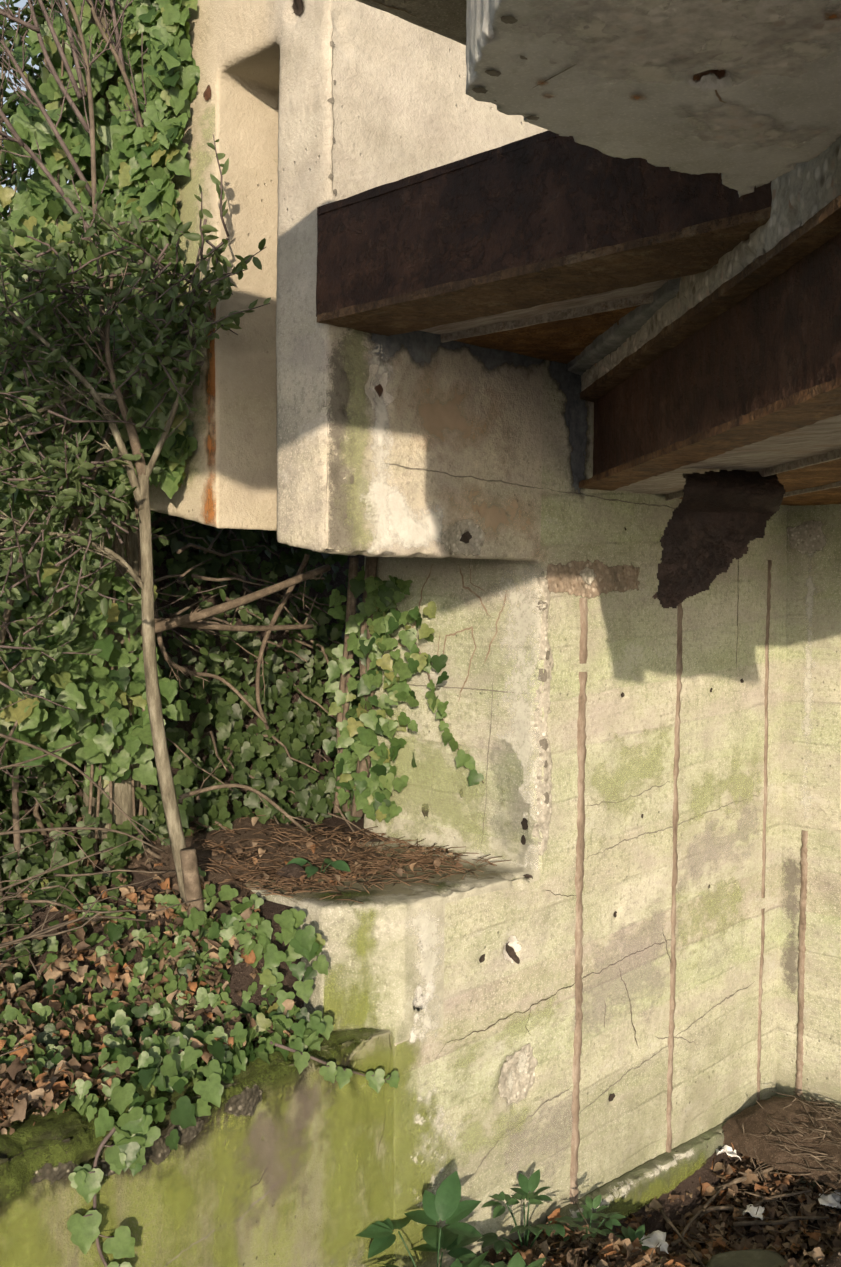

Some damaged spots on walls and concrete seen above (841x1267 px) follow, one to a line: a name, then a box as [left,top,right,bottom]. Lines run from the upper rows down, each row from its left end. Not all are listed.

spalling [472,70,501,102]
spalling [554,0,841,82]
corrosion [204,306,216,524]
spalling [441,511,485,556]
water stain [361,331,590,553]
crack [369,460,676,509]
spalling [521,559,640,856]
crack [437,929,696,1057]
water stain [323,1043,351,1069]
water stain [30,1073,302,1189]
water stain [410,1089,455,1199]